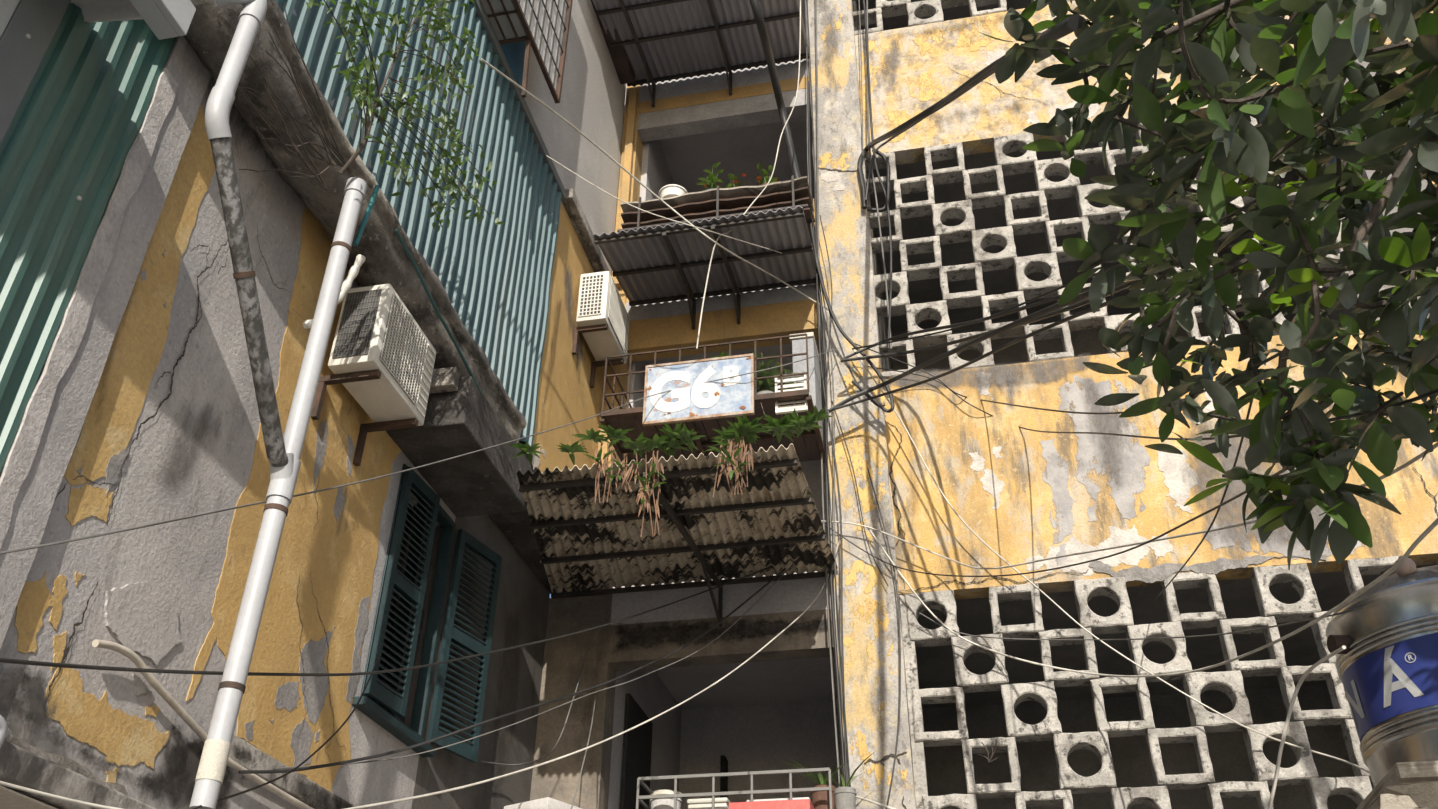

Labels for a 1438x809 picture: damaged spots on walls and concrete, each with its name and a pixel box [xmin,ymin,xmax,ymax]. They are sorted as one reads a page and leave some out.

peeling [1055,101,1100,121]
crack [48,582,98,697]
peeling [7,571,170,783]
leakage [0,667,204,808]
peeling [64,105,215,527]
crack [54,228,305,525]
leakage [167,411,218,483]
peeling [186,423,270,701]
leakage [215,745,251,809]
peeling [275,209,333,436]
peeling [237,301,402,792]
peeling [1024,375,1334,584]